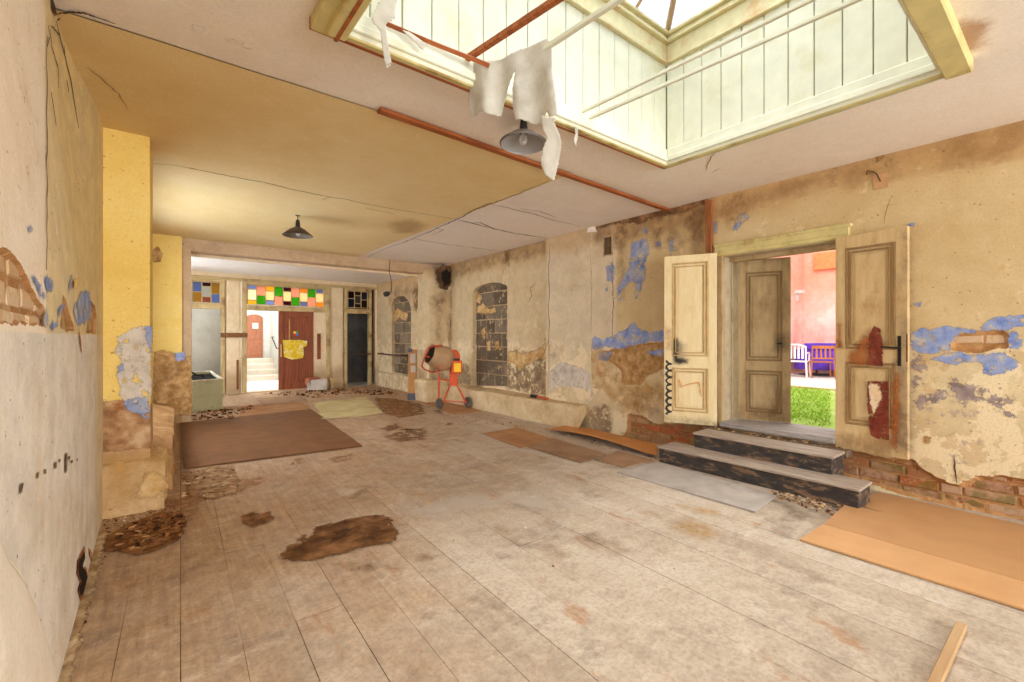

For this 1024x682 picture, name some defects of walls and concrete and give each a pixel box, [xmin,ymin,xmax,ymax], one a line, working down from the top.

crack [46,11,128,270]
flaking render [0,255,94,332]
spalling [103,325,193,452]
crack [153,163,615,388]
peeling [476,291,593,397]
spalling [592,323,664,384]
peeling [587,199,707,303]
peeling [868,383,882,414]
peeling [910,314,1024,418]
flaking render [844,453,1024,516]